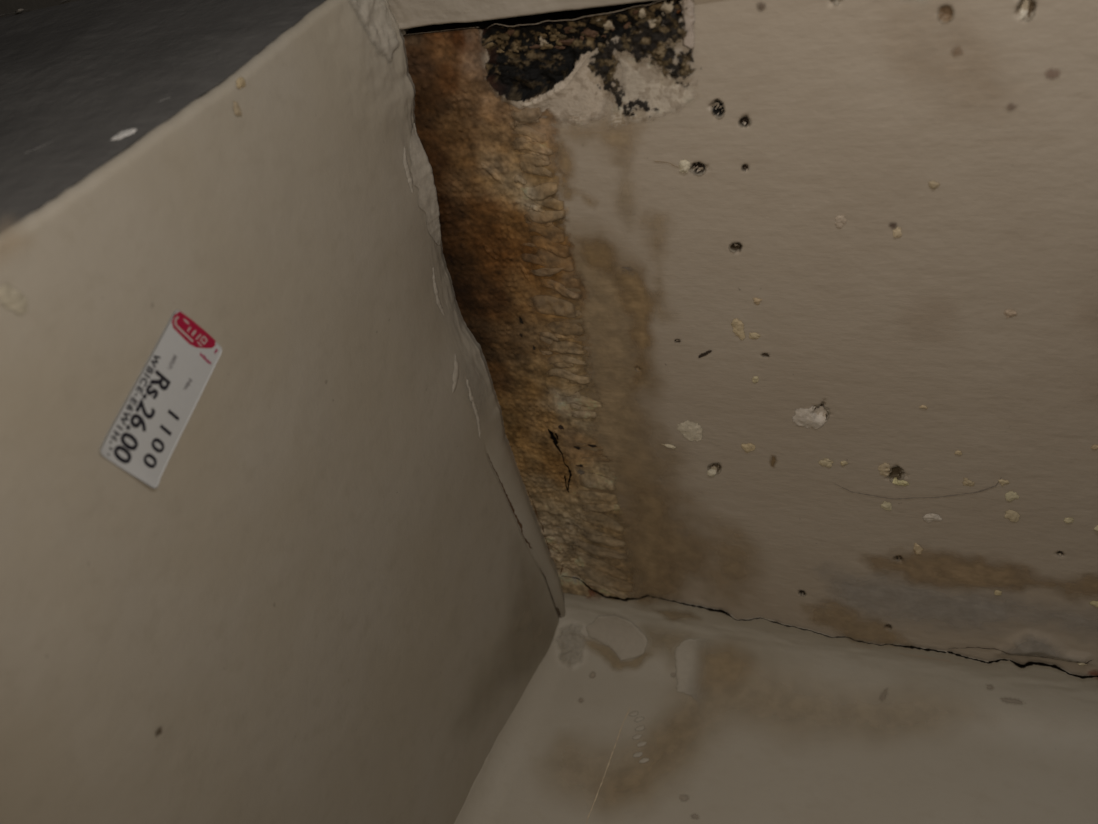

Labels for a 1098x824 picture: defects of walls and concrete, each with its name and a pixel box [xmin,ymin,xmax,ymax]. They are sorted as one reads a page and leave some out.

spalling [1017,0,1036,21]
peeling [403,0,695,600]
damp [566,241,704,601]
peeling [792,402,830,429]
crack [548,429,572,492]
crack [487,453,1098,679]
damp [871,553,1098,596]
peeling [586,615,648,661]